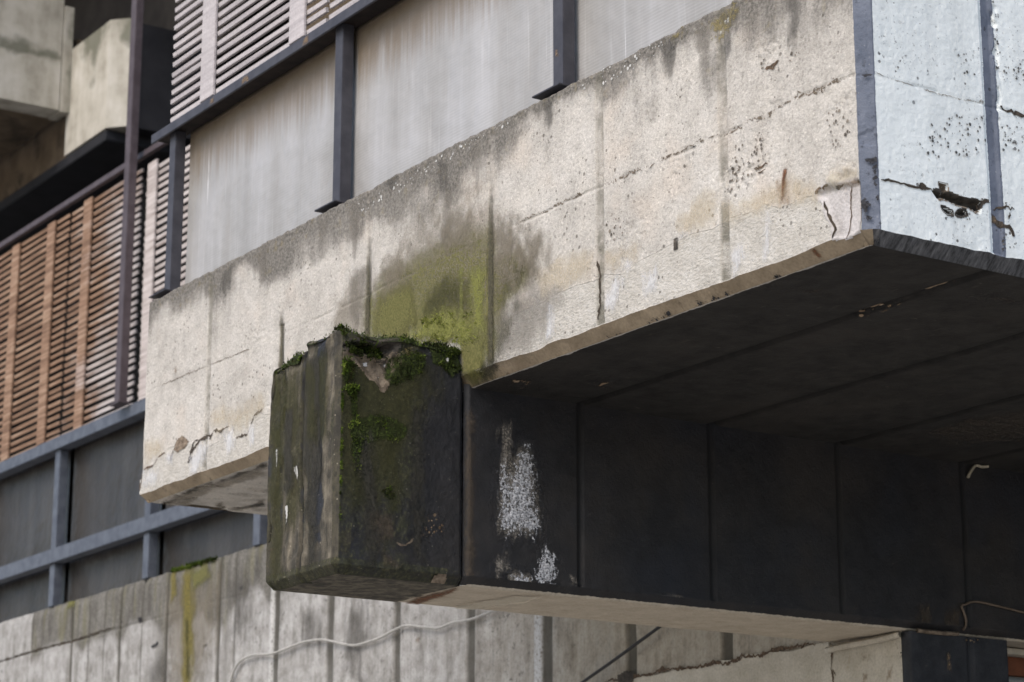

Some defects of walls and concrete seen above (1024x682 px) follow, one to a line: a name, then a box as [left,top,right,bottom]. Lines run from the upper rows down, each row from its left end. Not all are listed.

water stain [666,42,674,72]
crack [518,192,582,225]
water stain [479,201,497,381]
crack [594,261,602,319]
spalling [343,337,402,393]
spalling [174,436,189,453]
water stain [497,423,556,584]